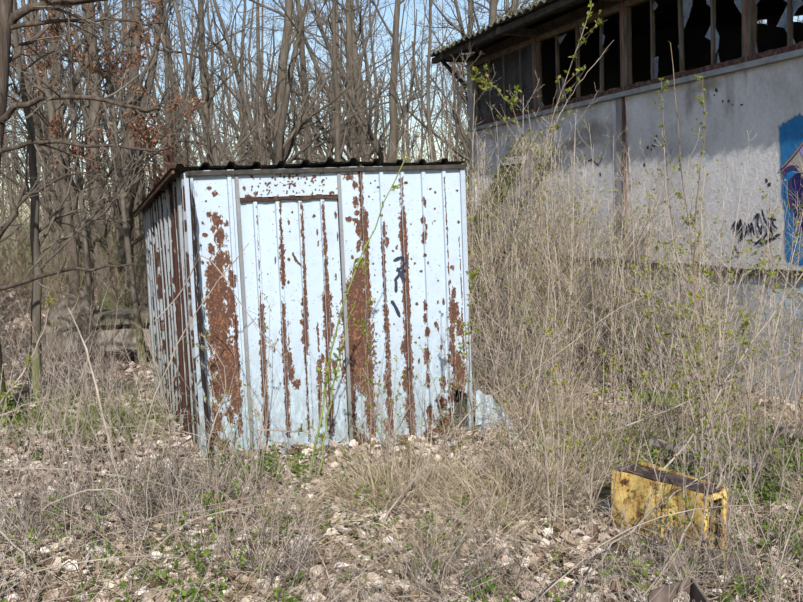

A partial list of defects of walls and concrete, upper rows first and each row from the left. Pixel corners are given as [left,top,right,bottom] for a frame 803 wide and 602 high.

corrosion [148,128,244,458]
corrosion [243,163,467,446]